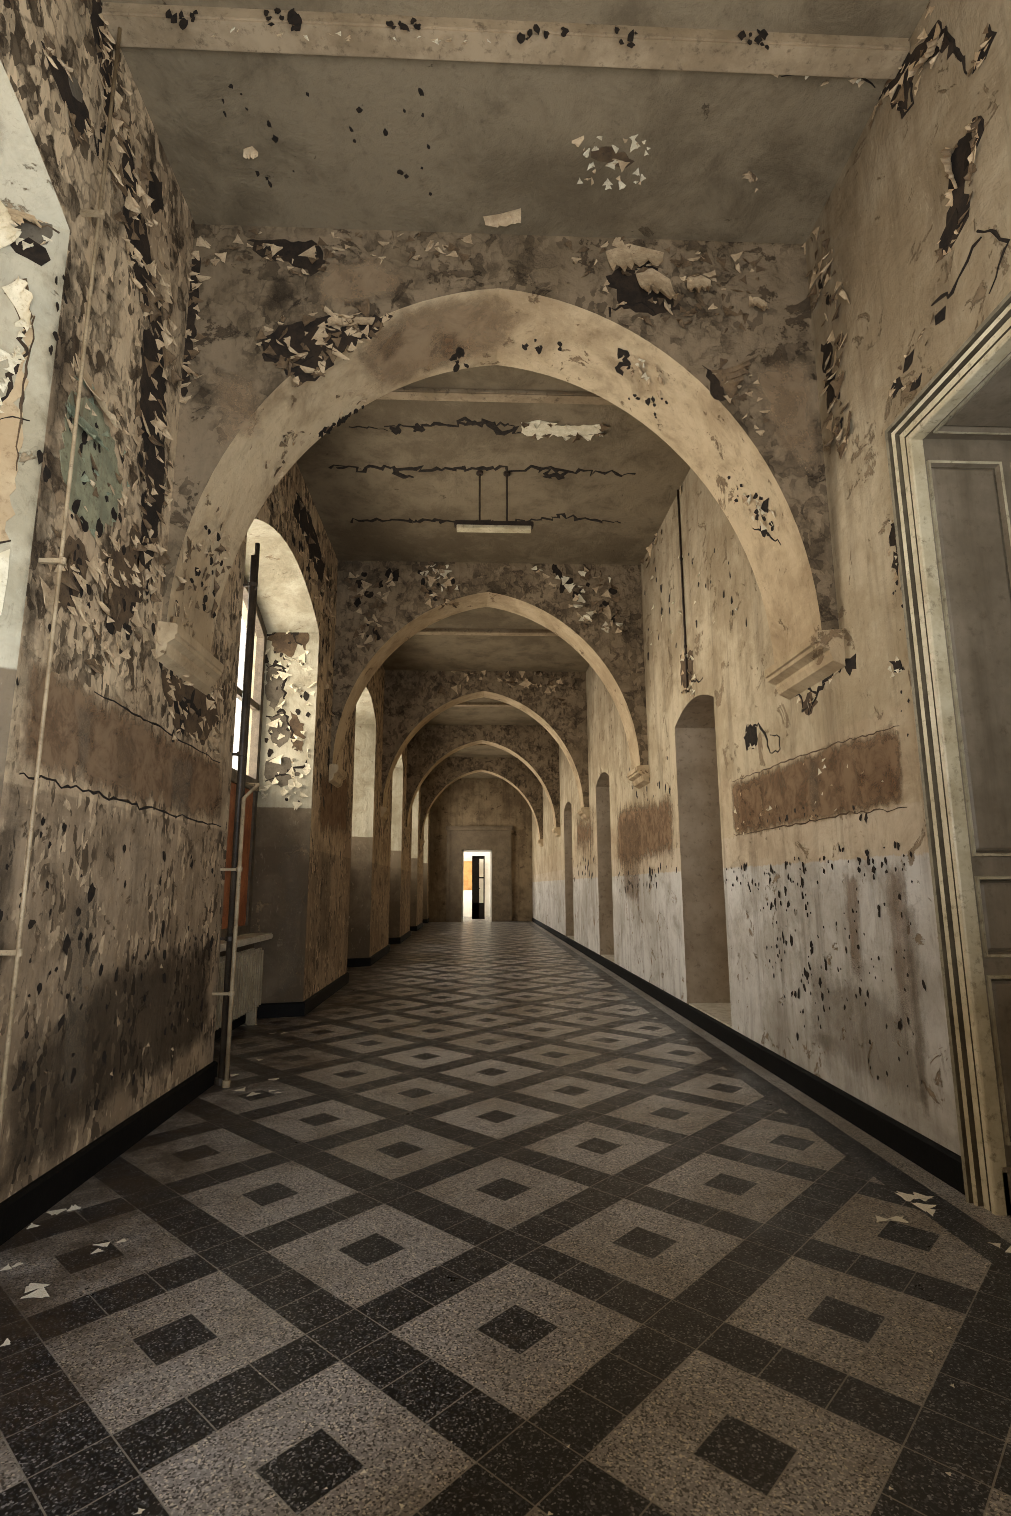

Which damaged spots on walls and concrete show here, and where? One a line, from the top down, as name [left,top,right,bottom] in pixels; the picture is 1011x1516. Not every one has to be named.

spalling [517,24,569,44]
spalling [615,27,638,48]
spalling [738,29,769,50]
peeling [868,2,997,129]
peeling [572,134,650,190]
water stain [54,270,73,411]
peeling [0,0,521,810]
peeling [522,339,562,354]
peeling [564,236,769,333]
peeling [889,116,1010,398]
water stain [19,585,221,827]
water stain [0,949,211,1188]